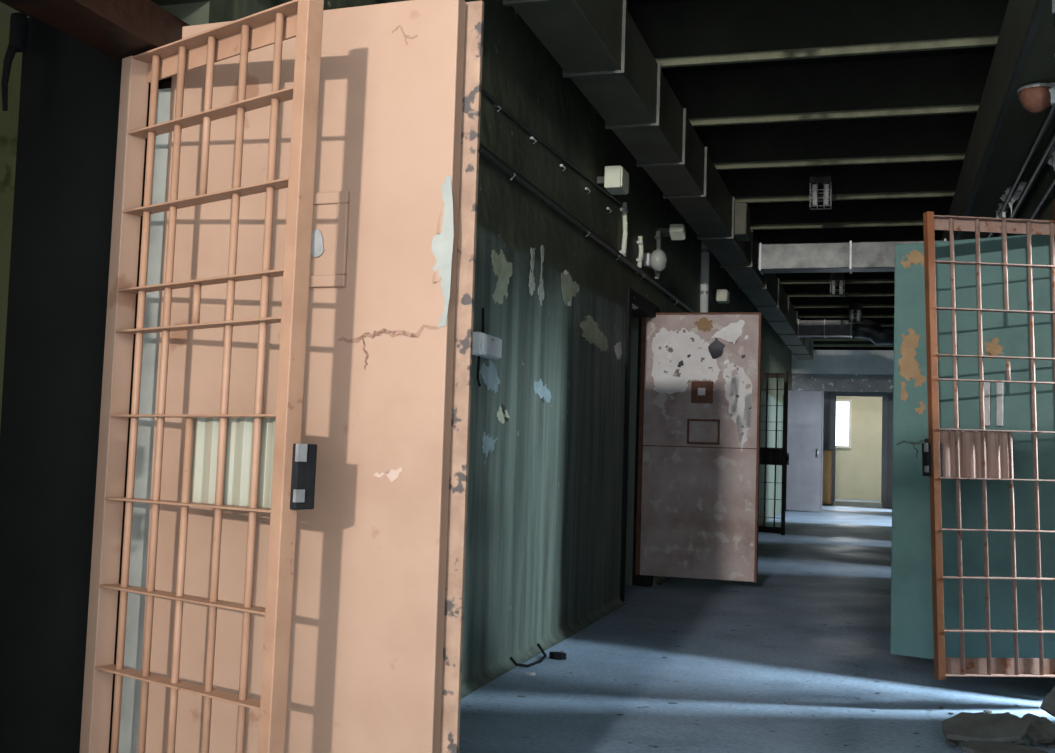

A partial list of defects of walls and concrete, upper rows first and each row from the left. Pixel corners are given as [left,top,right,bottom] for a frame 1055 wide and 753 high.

peeling [431,175,454,329]
peeling [491,248,513,304]
peeling [528,246,545,306]
peeling [561,270,579,306]
crack [338,324,438,369]
peeling [581,315,622,359]
peeling [479,360,500,393]
peeling [533,379,551,403]
peeling [651,320,752,452]
peeling [497,404,510,424]
peeling [482,432,497,458]